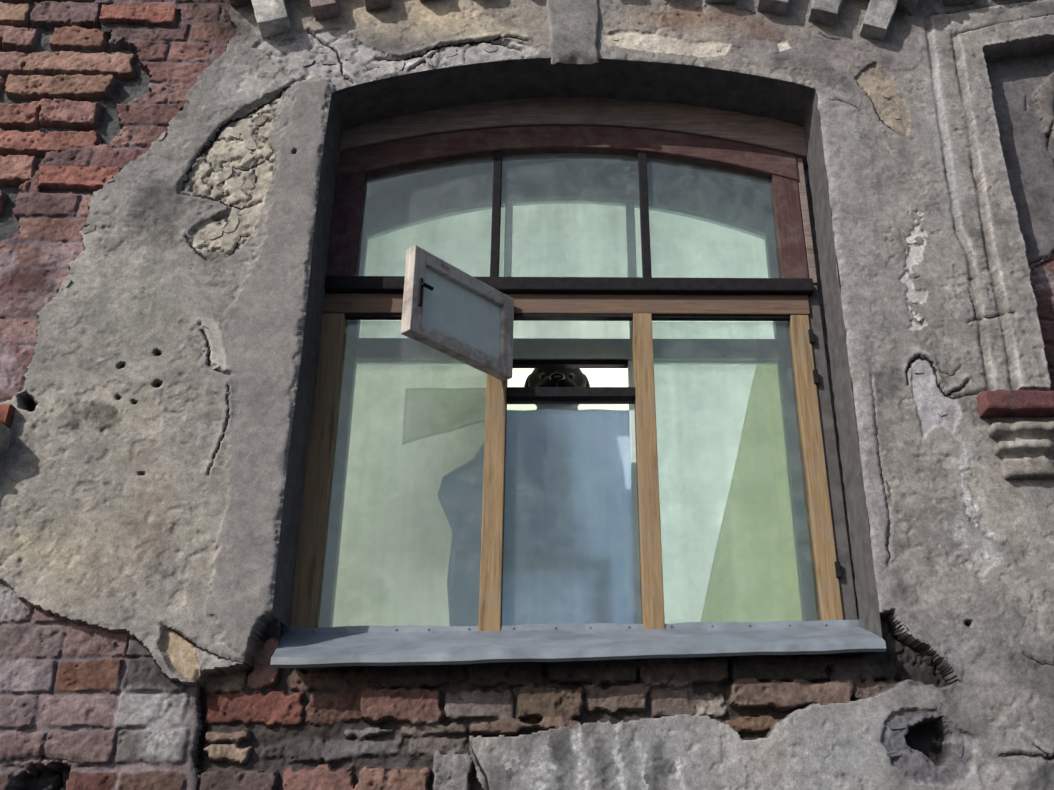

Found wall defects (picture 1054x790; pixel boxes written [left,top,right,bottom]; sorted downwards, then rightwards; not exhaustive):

crack [308,31,353,83]
crack [378,36,524,71]
spalling [855,61,912,138]
spalling [0,0,237,412]
spalling [1030,253,1054,391]
crack [201,331,230,475]
crack [871,378,891,565]
spalling [0,579,960,790]
spalling [881,707,978,786]
crack [999,743,1054,760]